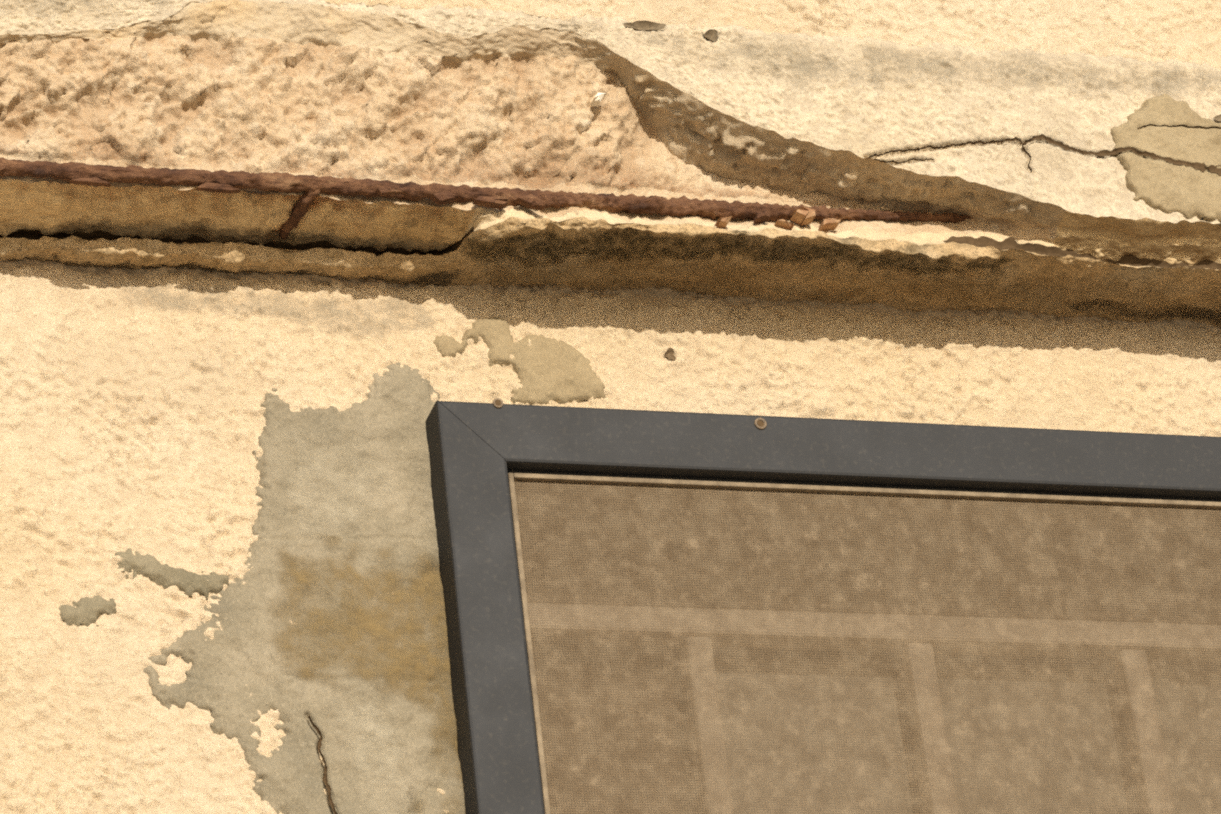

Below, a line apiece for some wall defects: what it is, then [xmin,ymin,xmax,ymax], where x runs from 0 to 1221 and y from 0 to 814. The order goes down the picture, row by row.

spalling [0,0,1221,266]
crack [867,124,1221,176]
crack [0,226,474,256]